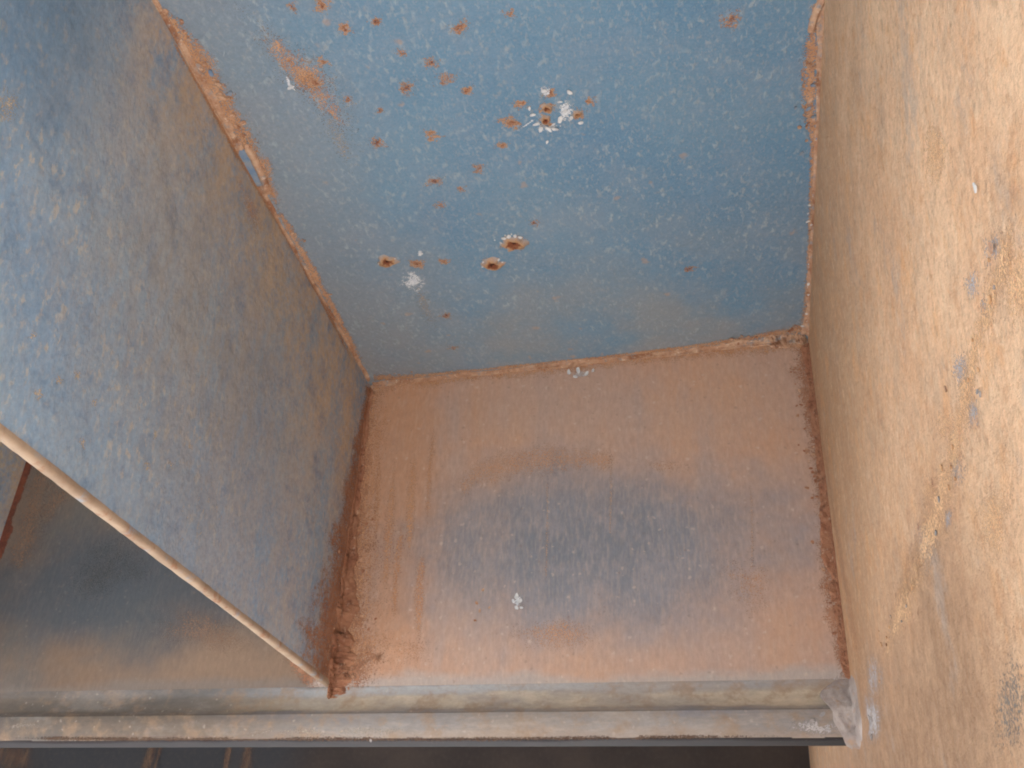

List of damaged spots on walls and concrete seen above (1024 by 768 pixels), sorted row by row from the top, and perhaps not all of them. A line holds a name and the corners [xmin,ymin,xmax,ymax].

peeling [234,137,271,228]
rust [152,0,850,699]